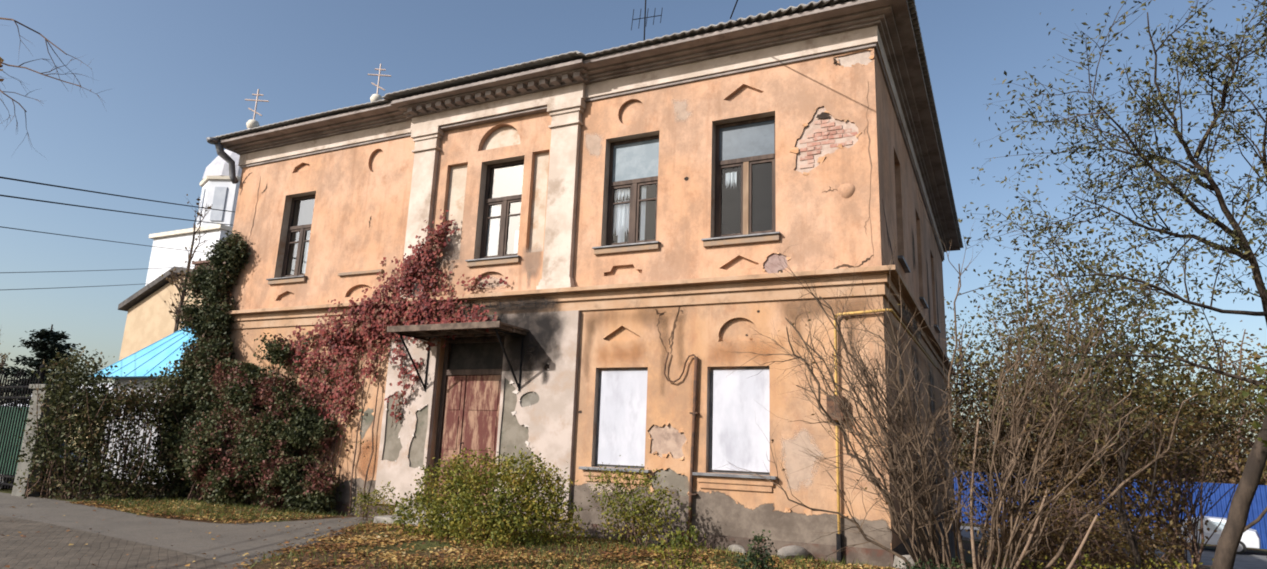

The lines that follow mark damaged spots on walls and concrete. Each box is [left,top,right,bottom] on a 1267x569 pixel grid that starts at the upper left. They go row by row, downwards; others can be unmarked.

spalling [789,106,862,176]
spalling [762,252,791,273]
water stain [528,351,548,382]
spalling [360,390,428,469]
spalling [497,378,539,474]
flaking render [569,419,892,550]